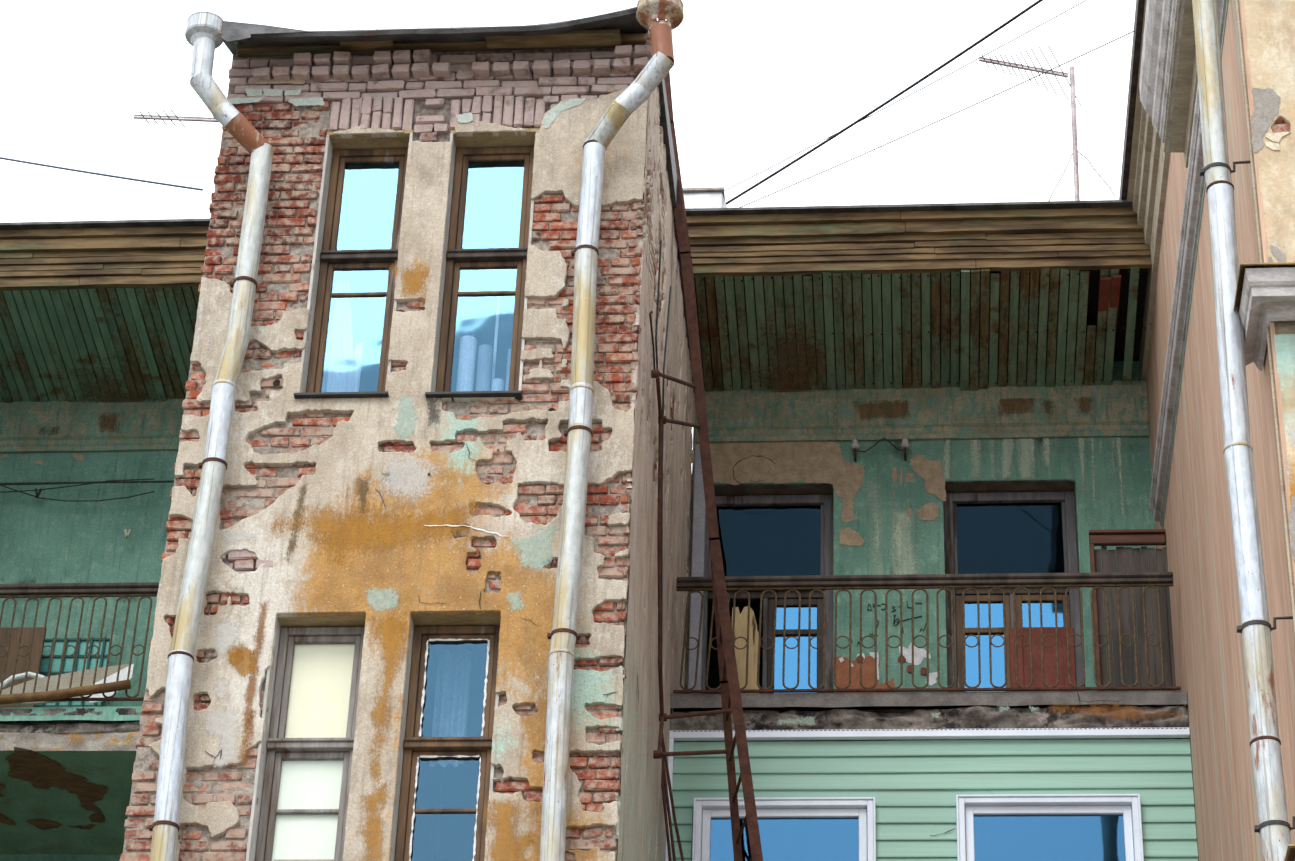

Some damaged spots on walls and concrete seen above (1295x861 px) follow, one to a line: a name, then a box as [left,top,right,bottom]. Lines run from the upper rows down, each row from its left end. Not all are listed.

flaking render [198,126,251,294]
flaking render [227,45,653,418]
flaking render [179,363,211,442]
flaking render [378,194,579,612]
flaking render [169,463,202,500]
leakage [214,620,239,656]
flaking render [204,593,250,616]
flaking render [220,550,273,574]
flaking render [219,412,352,530]
leakage [272,454,476,565]
flaking render [0,683,166,861]
flaking render [565,704,624,861]